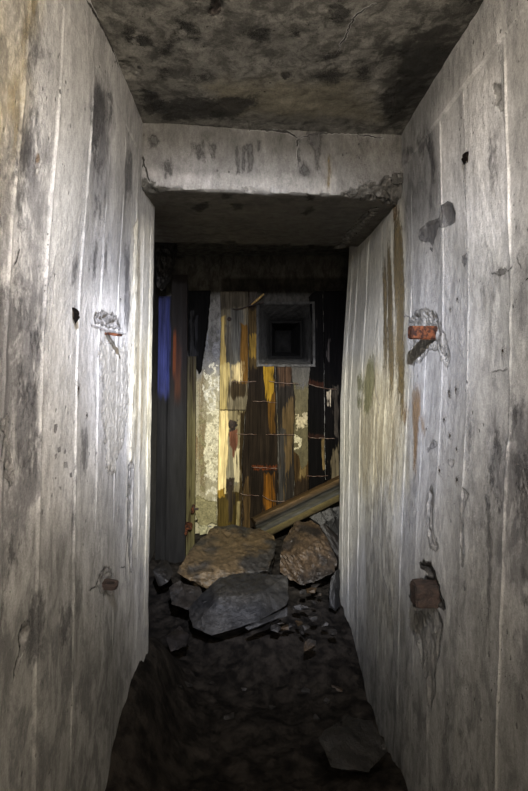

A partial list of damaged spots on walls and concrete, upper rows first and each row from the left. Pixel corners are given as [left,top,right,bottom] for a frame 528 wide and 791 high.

damp [140,89,258,120]
crack [142,154,151,183]
damp [235,141,260,173]
spalling [341,172,403,207]
peeling [418,201,456,252]
crack [491,257,528,281]
spalling [94,310,121,330]
spalling [407,307,451,367]
peeling [195,330,220,535]
spalling [426,485,439,552]
spalling [409,559,446,708]